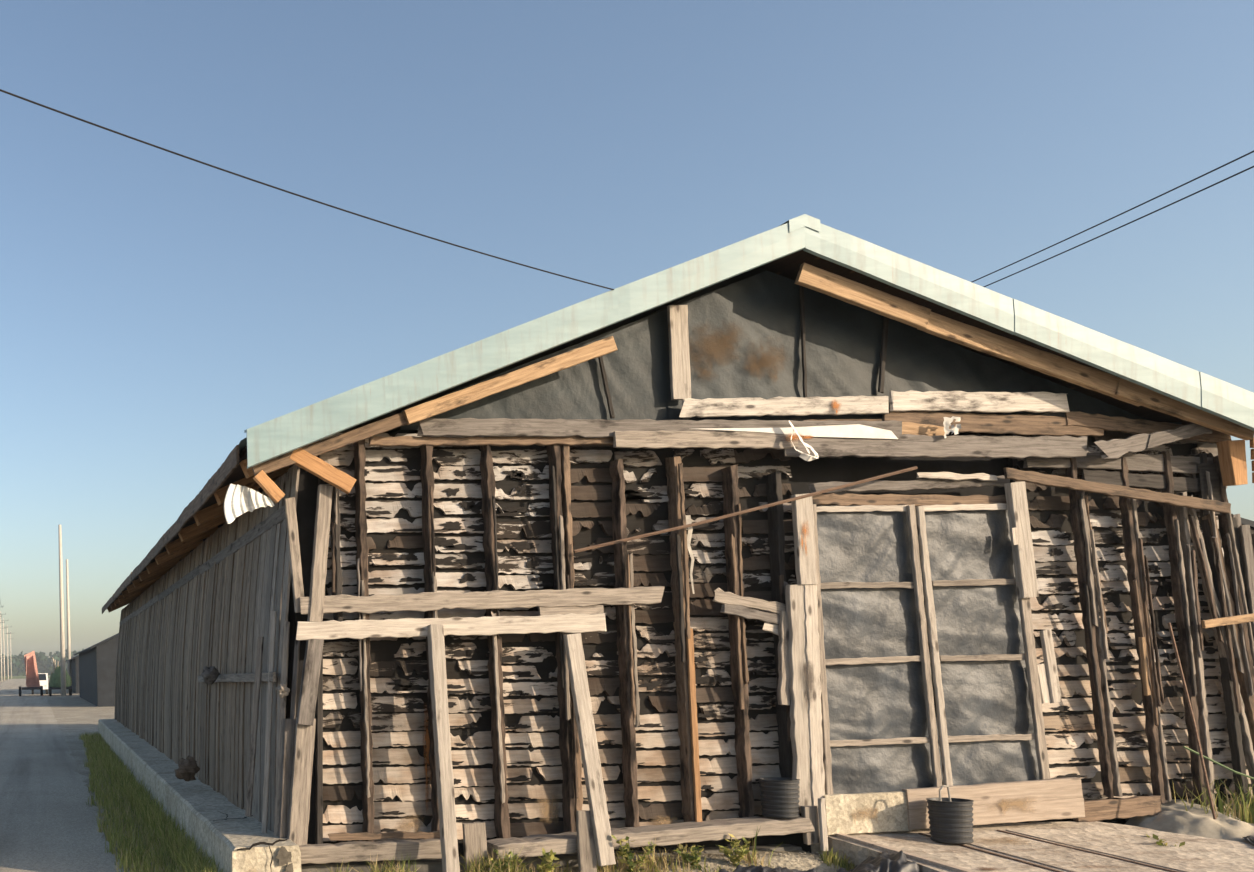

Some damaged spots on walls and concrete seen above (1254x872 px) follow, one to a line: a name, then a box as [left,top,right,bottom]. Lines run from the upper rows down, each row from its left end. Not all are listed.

peeling [496,470,550,516]
peeling [624,487,662,500]
peeling [364,449,485,583]
peeling [368,553,418,596]
peeling [1032,532,1080,609]
peeling [449,649,543,696]
peeling [1108,642,1139,674]
peeling [1157,622,1182,693]
peeling [447,684,491,728]
peeling [506,761,543,782]
peeling [1051,757,1095,779]
peeling [376,798,405,832]